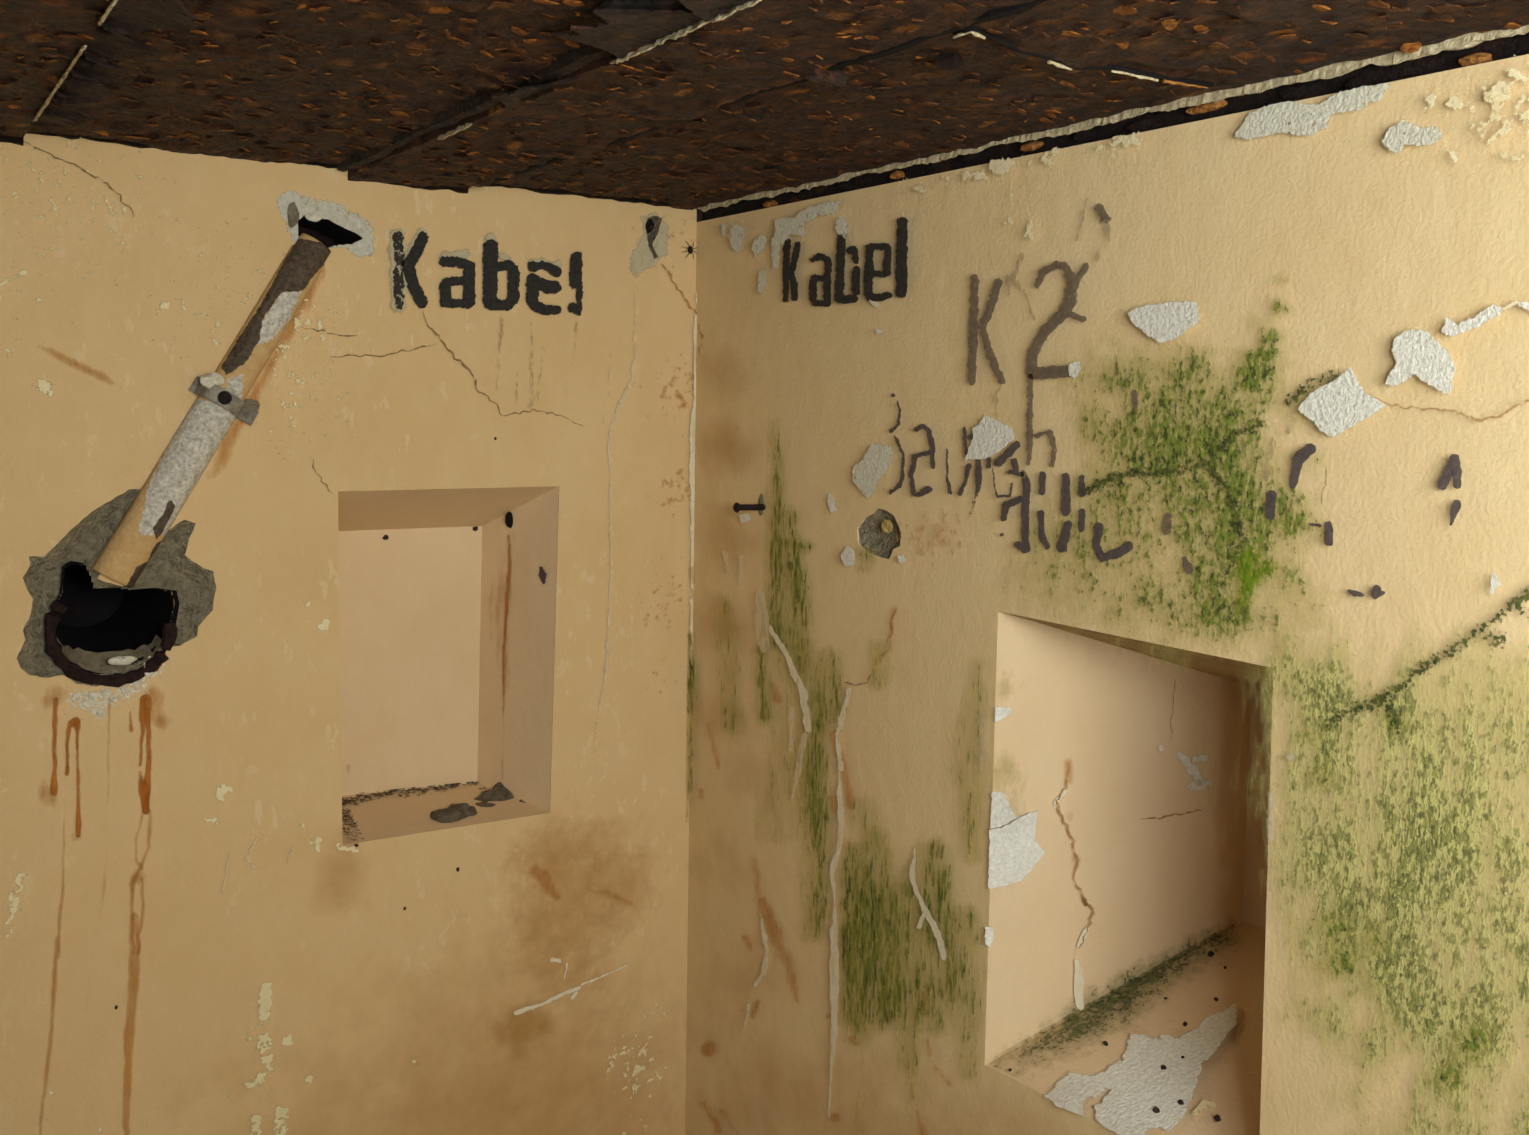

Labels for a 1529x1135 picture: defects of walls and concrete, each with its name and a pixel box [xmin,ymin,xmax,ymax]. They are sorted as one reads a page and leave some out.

peeling [1235,83,1390,140]
crack [302,311,583,426]
peeling [1298,300,1529,438]
crack [1080,370,1340,575]
leakage [755,590,812,799]
corrosion [51,698,81,837]
corrosion [130,695,162,835]
leakage [828,688,852,1118]
leakage [909,848,947,960]
crack [987,764,1095,1010]
corrosion [125,1016,133,1095]
peeling [1044,1003,1238,1135]